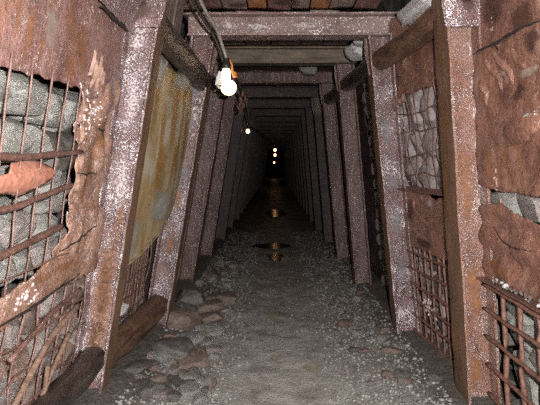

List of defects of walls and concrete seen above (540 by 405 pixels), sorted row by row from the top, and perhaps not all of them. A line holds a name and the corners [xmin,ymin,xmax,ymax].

crack [473,20,540,55]
rust [0,0,147,145]
rust [74,153,92,195]
crack [59,225,98,252]
crack [493,227,535,270]